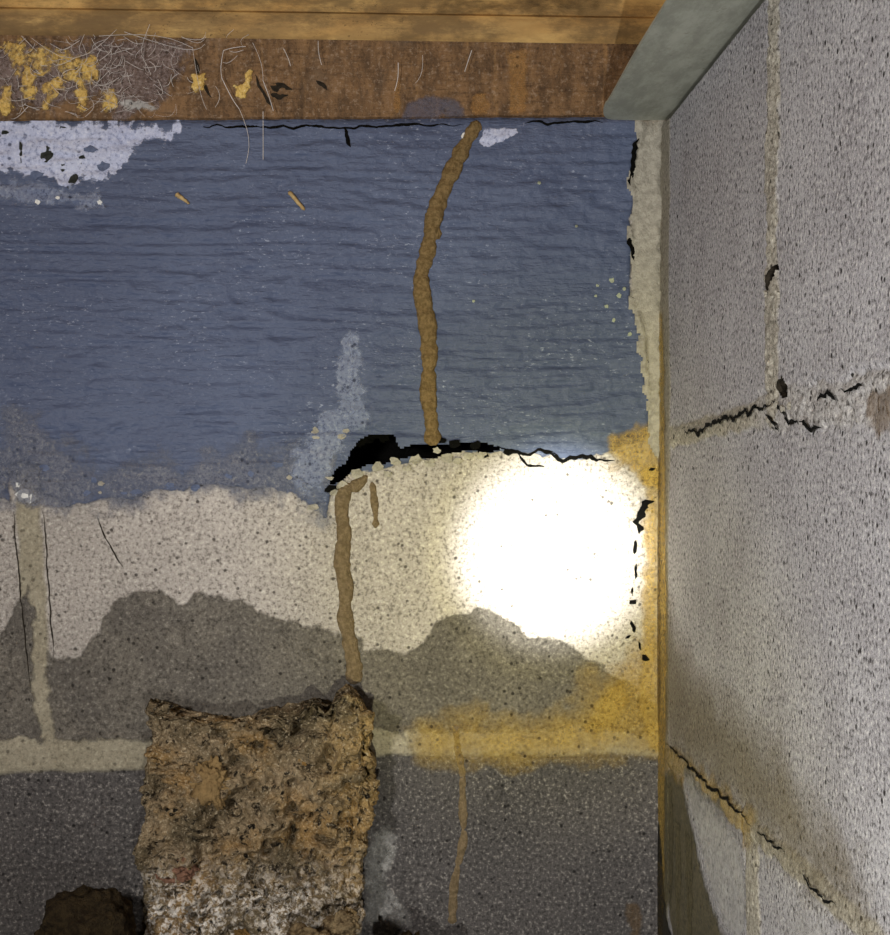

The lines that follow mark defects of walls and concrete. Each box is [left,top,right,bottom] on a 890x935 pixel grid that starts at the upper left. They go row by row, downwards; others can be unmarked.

peeling [0,120,182,210]
crack [498,446,615,467]
crack [682,400,821,438]
crack [817,383,862,401]
damp [0,590,43,744]
damp [45,590,658,742]
crack [667,744,784,852]
damp [657,768,745,935]
crack [803,875,836,905]